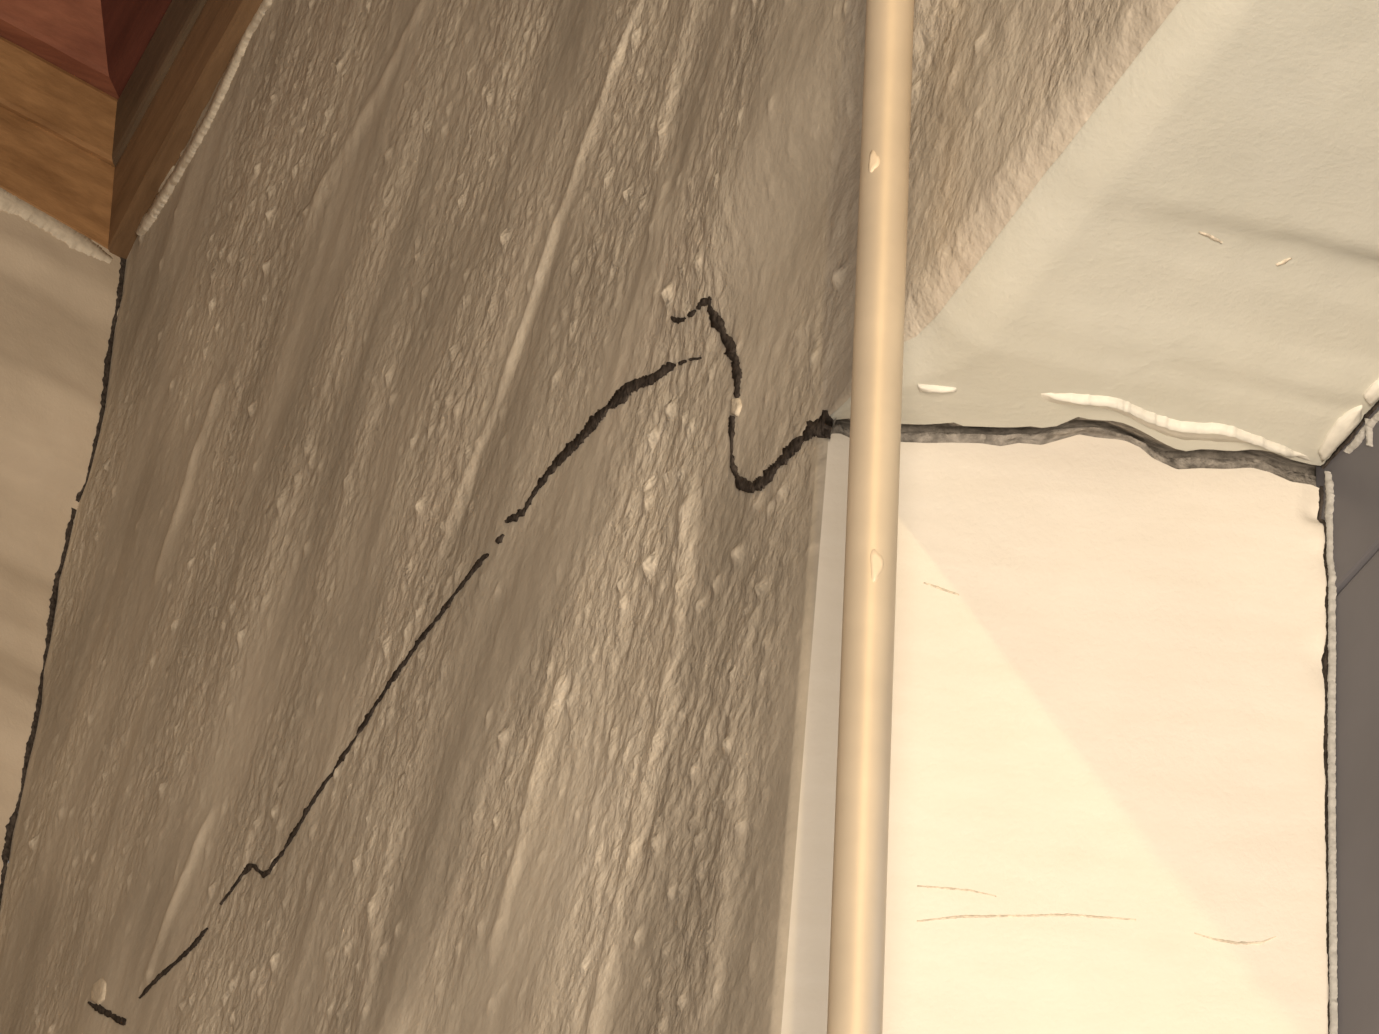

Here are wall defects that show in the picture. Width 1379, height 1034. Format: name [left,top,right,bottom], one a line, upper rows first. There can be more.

crack [0,257,126,906]
crack [88,296,850,1026]
crack [901,400,1379,1034]
peeling [1041,379,1379,462]